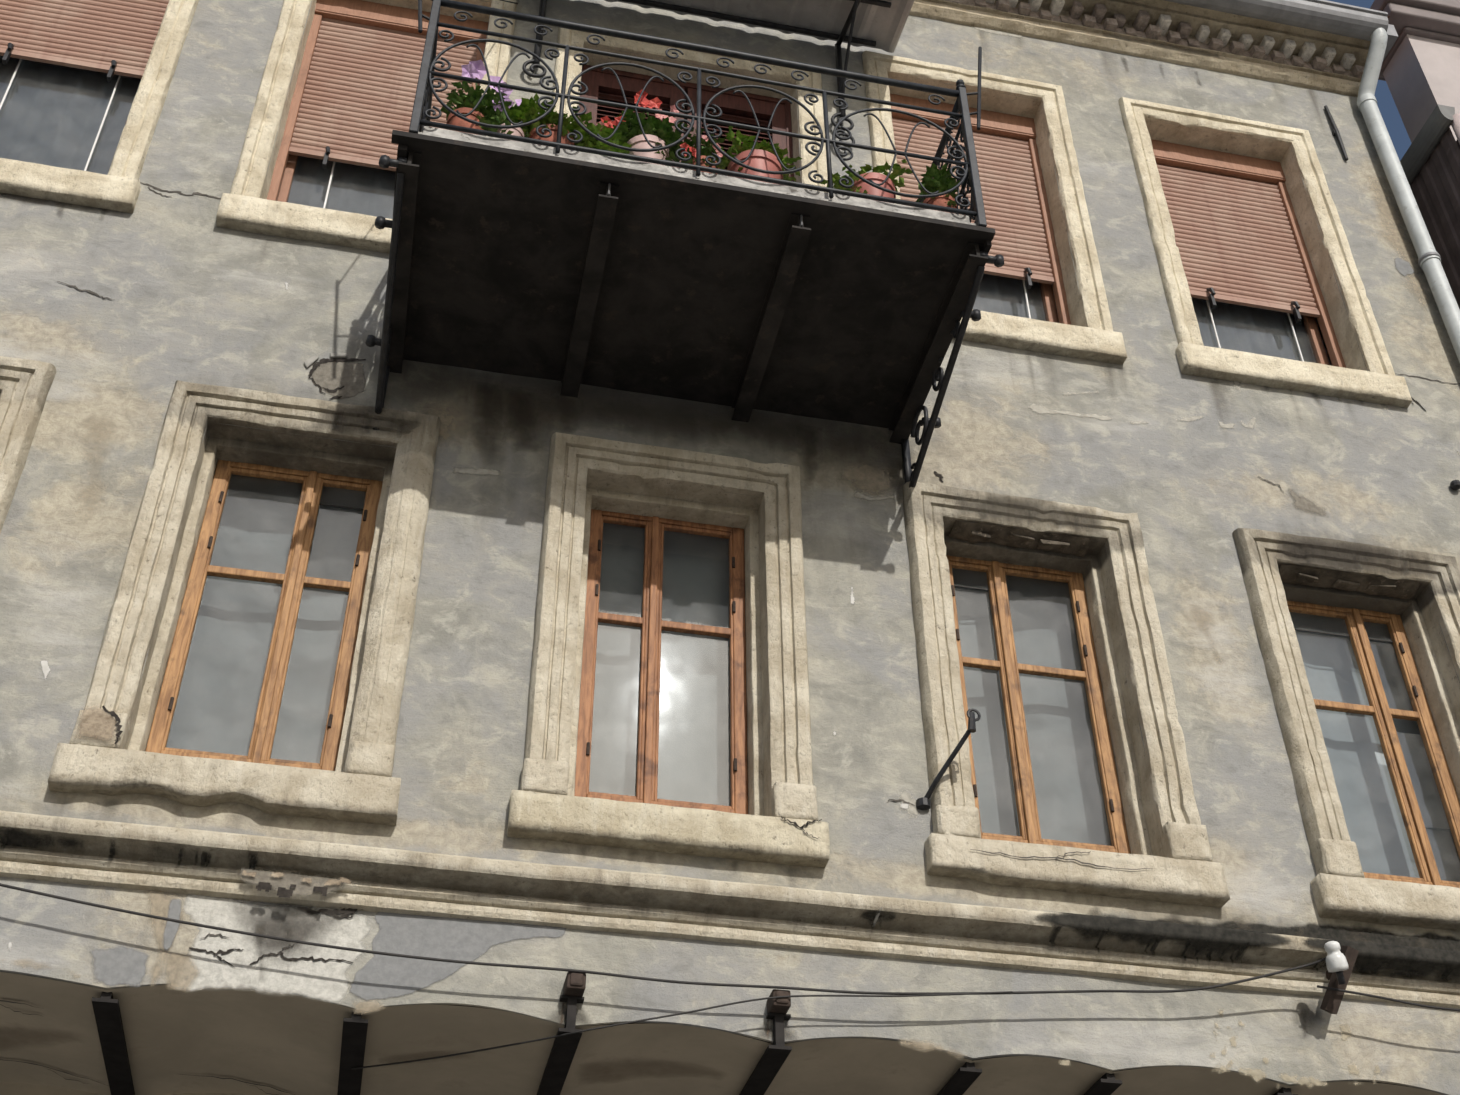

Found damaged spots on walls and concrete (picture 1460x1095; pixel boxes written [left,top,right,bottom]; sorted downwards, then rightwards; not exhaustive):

crack [140,182,221,199]
spalling [79,706,123,744]
water stain [0,829,82,849]
crack [781,816,822,839]
crack [297,906,363,918]
peeling [150,869,381,1011]
crack [189,933,353,967]
water stain [1036,912,1460,980]